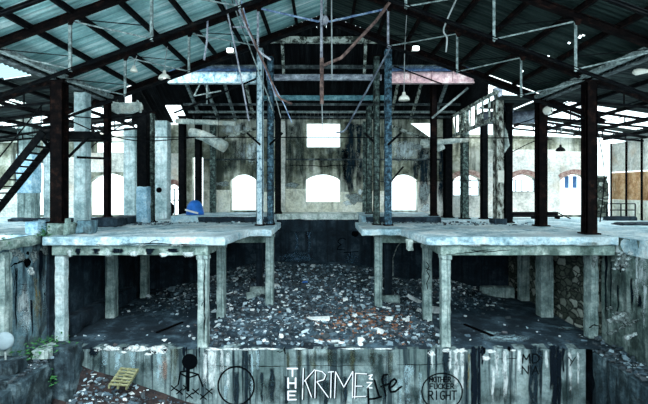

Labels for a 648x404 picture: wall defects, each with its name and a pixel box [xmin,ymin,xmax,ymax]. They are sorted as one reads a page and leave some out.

water stain [285,122,363,192]
spalling [8,245,48,275]
spalling [591,237,648,366]
water stain [89,347,104,367]
peeling [94,345,167,355]
water stain [196,347,216,384]
water stain [427,346,513,404]
water stain [528,345,579,404]
water stain [406,388,430,404]